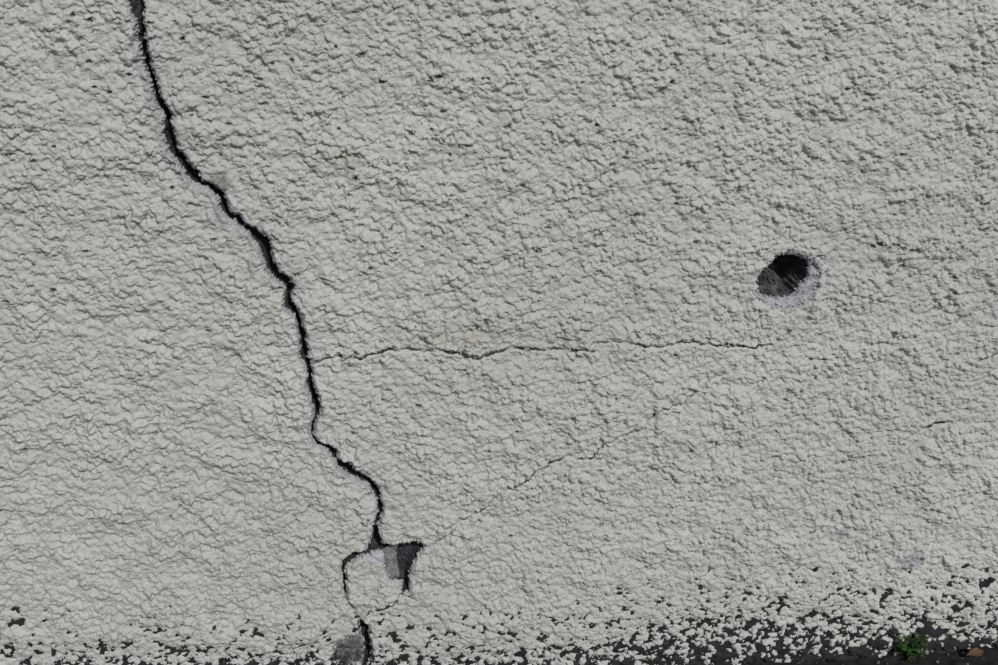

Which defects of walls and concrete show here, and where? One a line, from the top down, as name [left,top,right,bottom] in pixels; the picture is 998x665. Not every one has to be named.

crack [126,0,761,665]
spalling [754,252,824,310]
peeling [0,515,998,665]